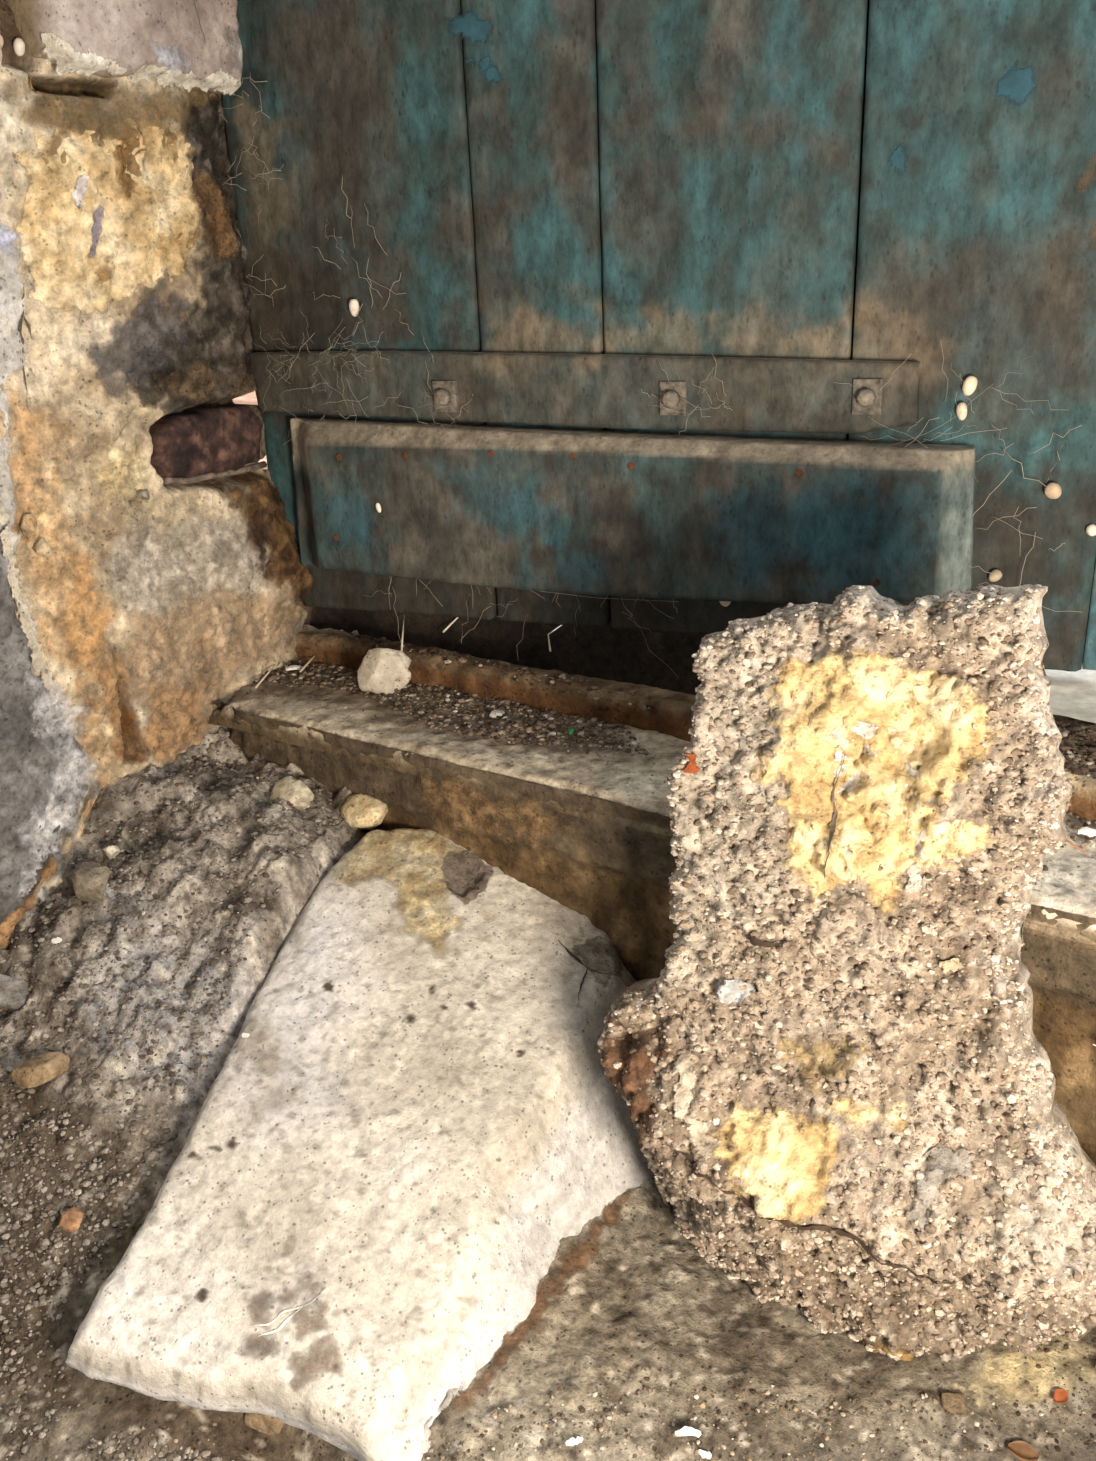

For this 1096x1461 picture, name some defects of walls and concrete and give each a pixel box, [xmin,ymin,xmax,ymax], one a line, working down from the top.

leakage [8,78,257,418]
peeling [997,67,1035,105]
spalling [0,117,204,925]